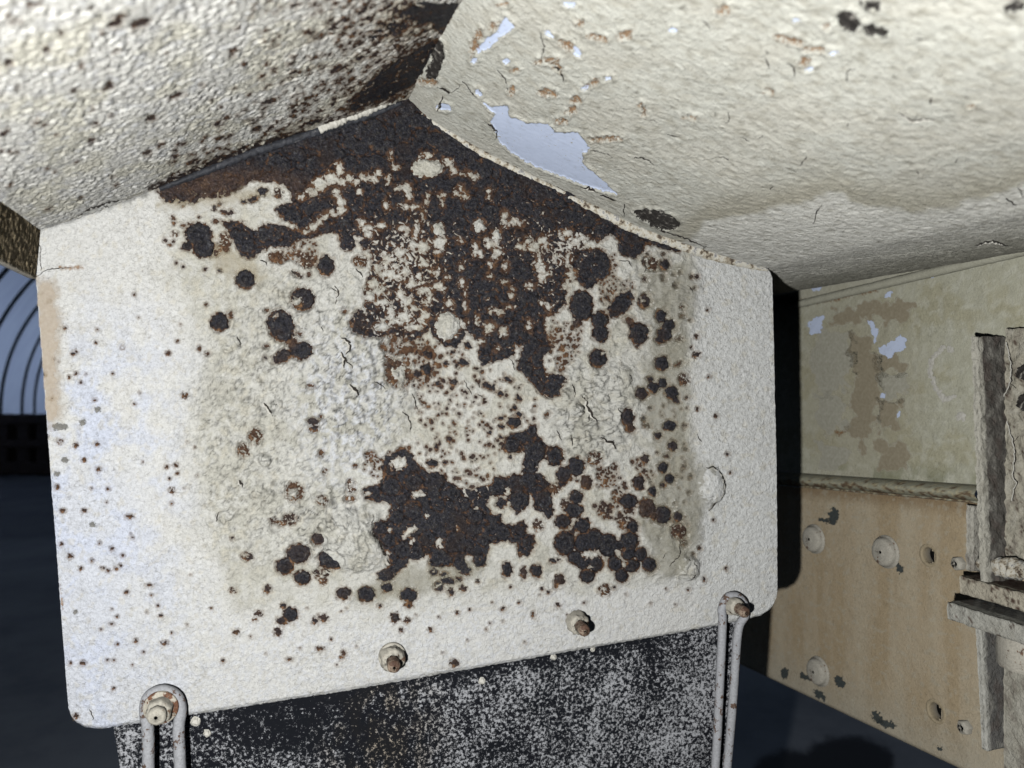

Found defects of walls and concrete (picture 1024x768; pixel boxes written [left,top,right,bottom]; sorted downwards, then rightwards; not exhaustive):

peeling [471,18,514,64]
peeling [475,89,617,195]
corrosion [148,0,701,637]
peeling [806,291,917,472]
crack [1004,341,1018,501]
peeling [818,507,839,525]
peeling [872,711,896,729]